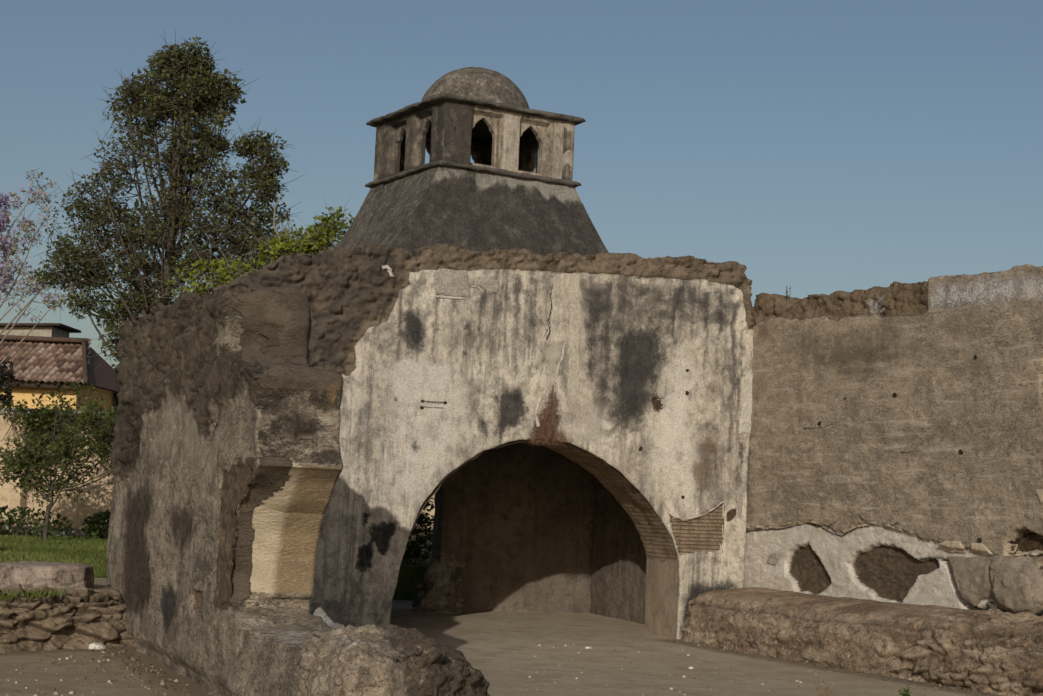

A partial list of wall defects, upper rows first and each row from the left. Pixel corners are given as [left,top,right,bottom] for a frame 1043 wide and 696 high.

flaking render [930,271,1043,309]
leakage [401,311,437,351]
leakage [567,274,658,439]
leakage [672,288,743,395]
leakage [478,389,528,434]
corrosion [530,386,567,444]
flaking render [739,372,753,467]
leakage [356,513,396,572]
flaking render [669,489,998,610]